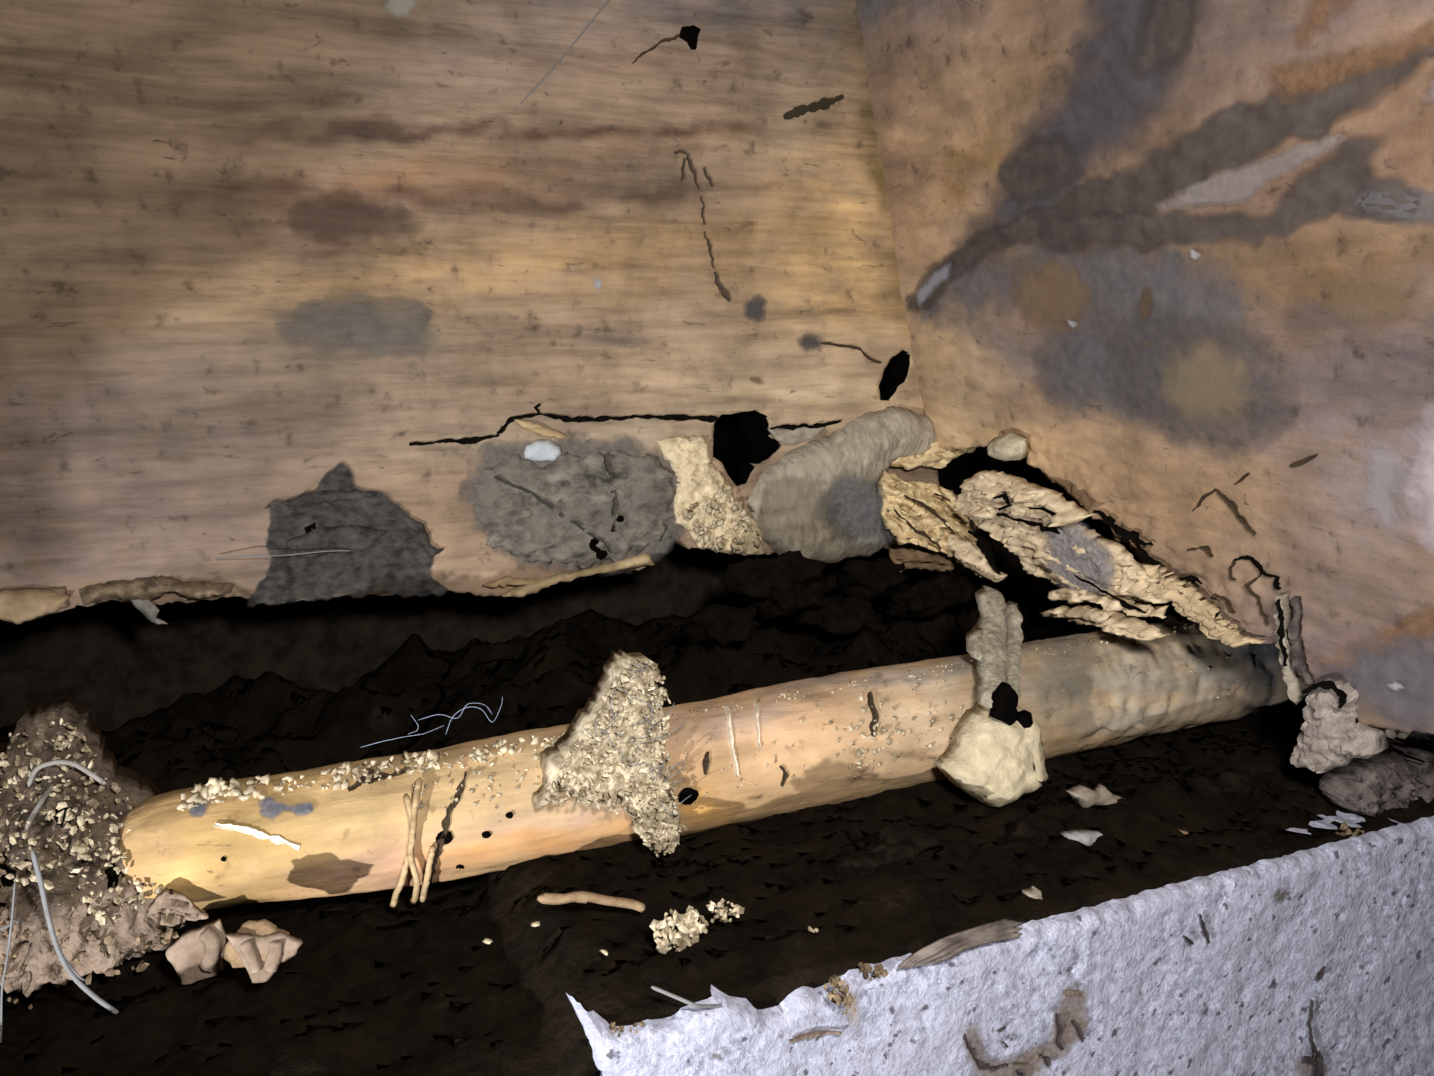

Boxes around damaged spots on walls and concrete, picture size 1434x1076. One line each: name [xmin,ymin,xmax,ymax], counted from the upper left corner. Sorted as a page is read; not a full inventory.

crack [673,150,731,302]
damp [908,0,1434,446]
crack [821,342,881,363]
peeling [265,489,387,559]
peeling [402,515,444,559]
crack [409,403,718,553]
peeling [501,515,655,597]
peeling [877,440,1266,648]
crack [1092,473,1281,625]
crack [1289,454,1318,467]
damp [1369,429,1434,547]
crack [1296,966,1327,1076]